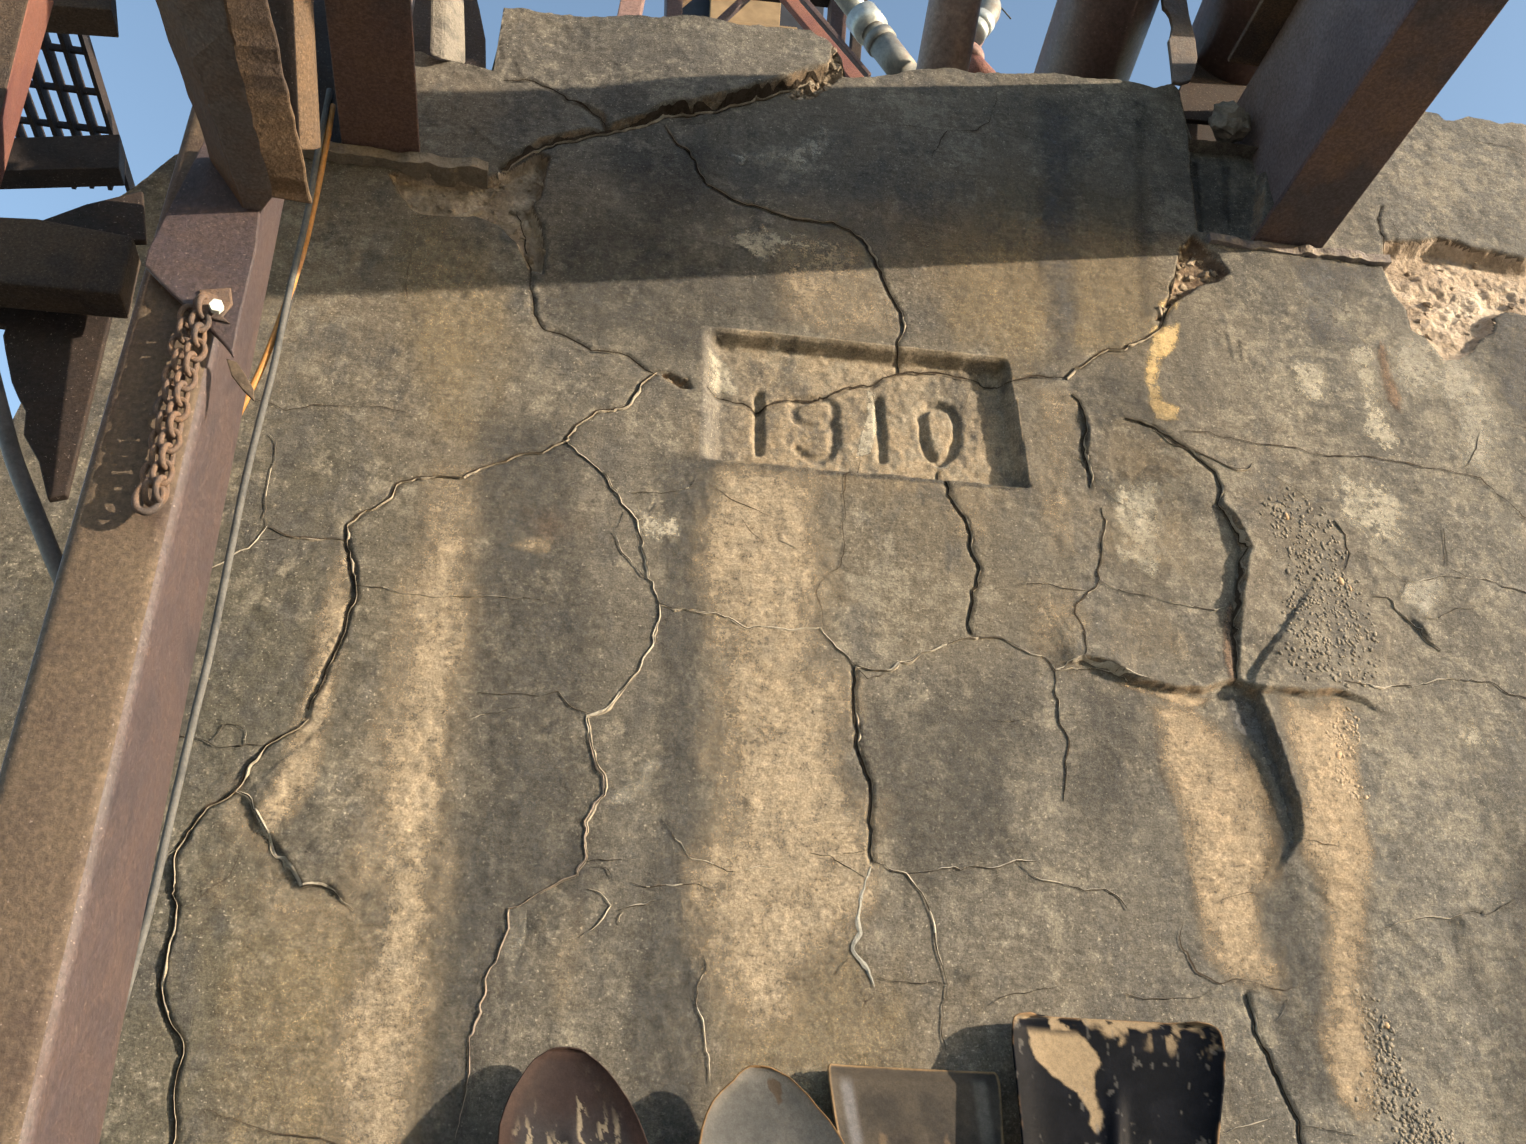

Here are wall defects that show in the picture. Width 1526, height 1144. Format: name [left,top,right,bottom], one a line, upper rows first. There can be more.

spalling [390,155,549,274]
crack [501,71,1176,509]
spalling [1145,235,1227,421]
spalling [1383,238,1526,360]
crack [158,207,1526,1144]
water stain [1154,706,1279,992]
water stain [1286,698,1377,1119]